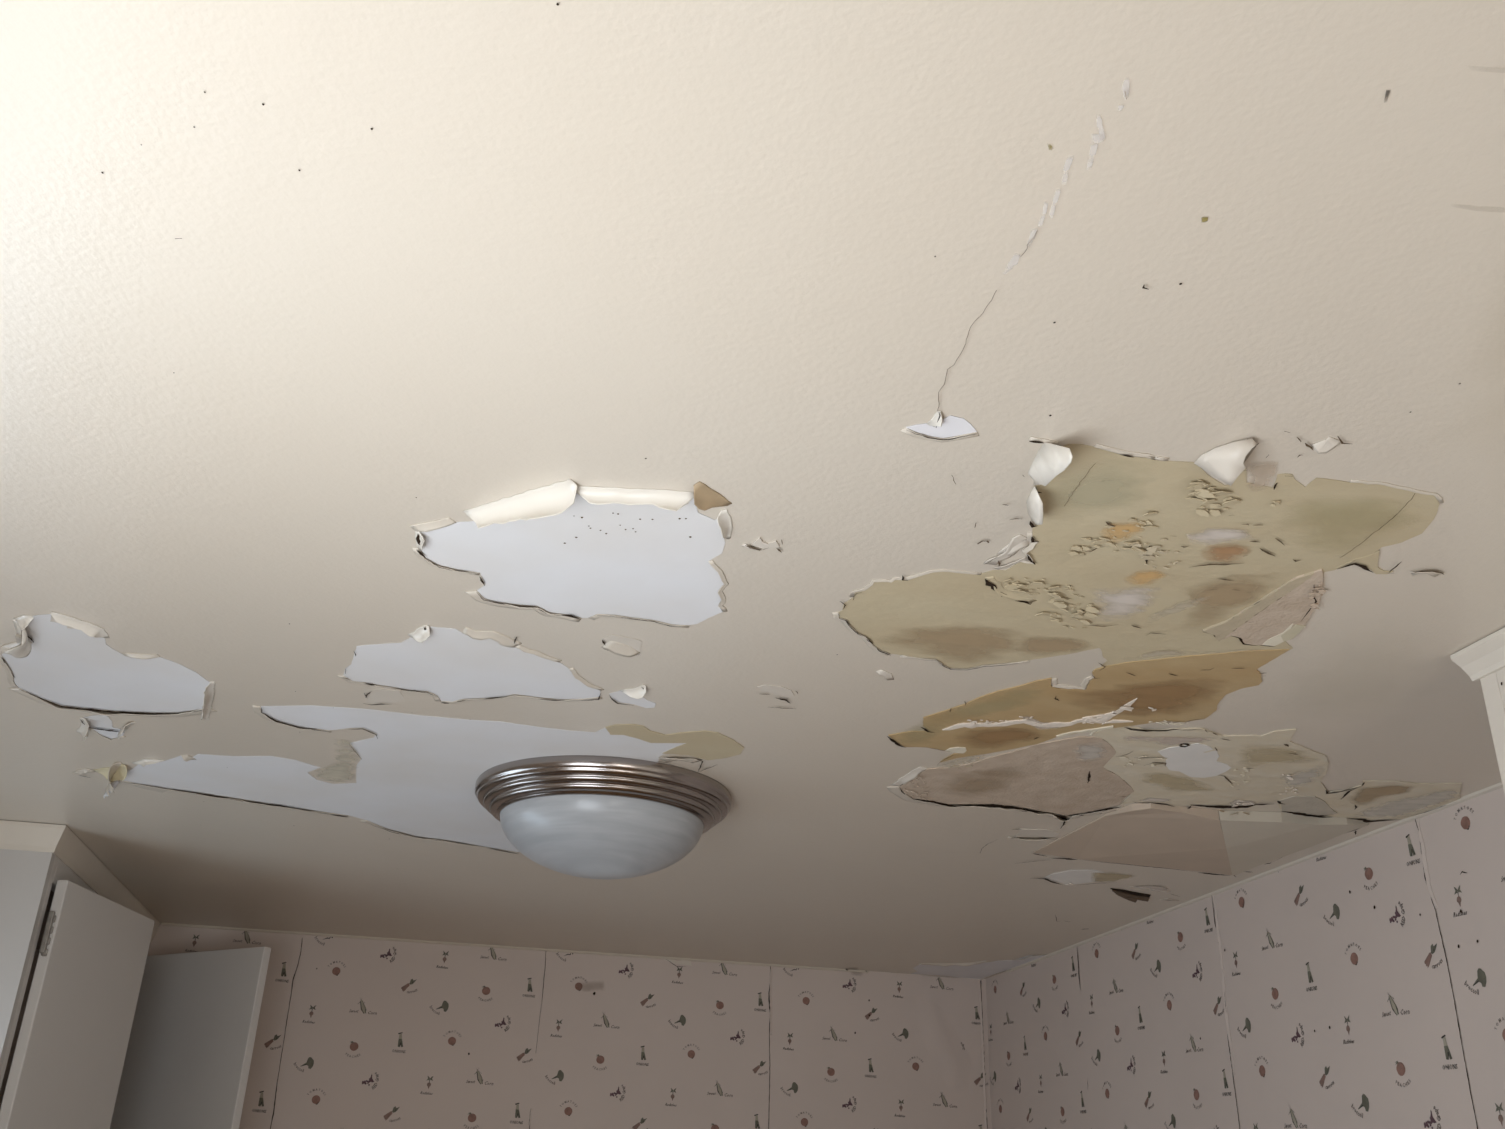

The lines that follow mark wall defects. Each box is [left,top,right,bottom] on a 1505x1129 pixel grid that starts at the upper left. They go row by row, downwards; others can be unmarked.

crack [937,290,997,413]
peeling [900,410,979,442]
peeling [409,479,733,658]
peeling [0,612,217,741]
peeling [73,625,744,854]
peeling [832,436,1462,841]
peeling [1035,870,1151,897]